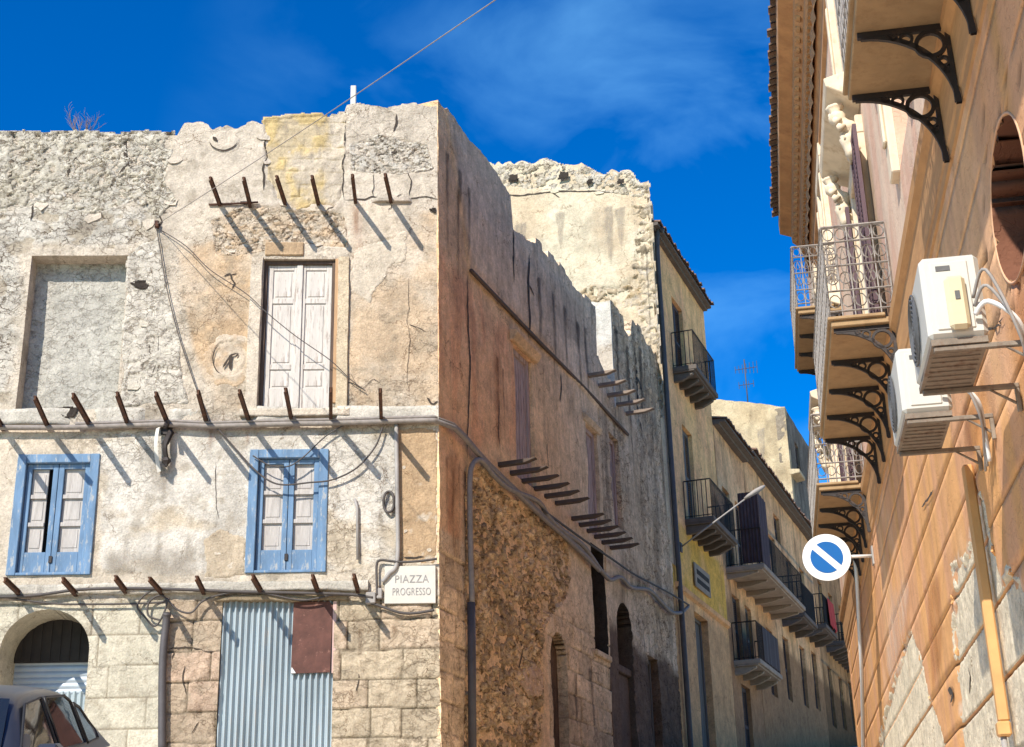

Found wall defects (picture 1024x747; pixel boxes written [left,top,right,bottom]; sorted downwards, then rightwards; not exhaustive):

spalling [0,129,189,407]
spalling [211,112,434,303]
spalling [463,465,571,747]
spalling [879,629,947,747]
spalling [950,491,1024,747]